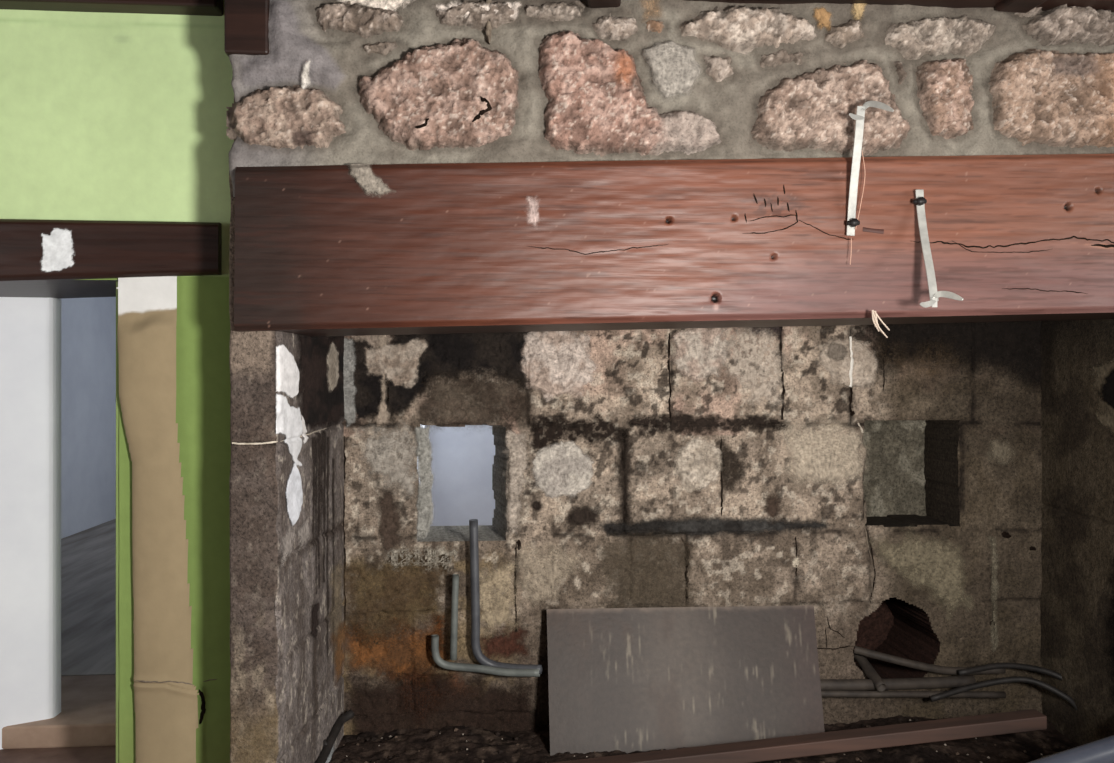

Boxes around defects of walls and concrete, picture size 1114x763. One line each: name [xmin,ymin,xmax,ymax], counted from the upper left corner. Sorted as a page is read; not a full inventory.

crack [528,244,667,255]
crack [743,214,850,240]
crack [913,236,1114,253]
crack [1003,287,1086,295]
spalling [1091,359,1114,433]
peeling [276,345,309,525]
leakage [281,429,457,714]
corrosion [334,615,448,723]